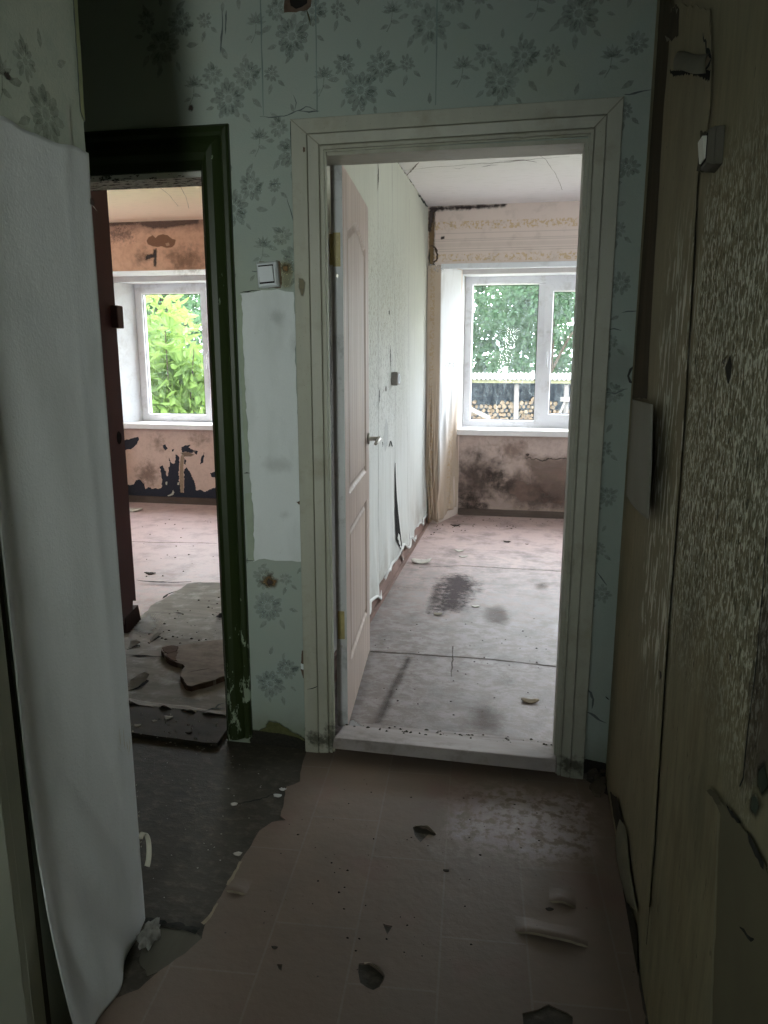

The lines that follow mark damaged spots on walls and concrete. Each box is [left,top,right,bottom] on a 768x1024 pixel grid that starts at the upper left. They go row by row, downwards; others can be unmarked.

spalling [284,0,311,13]
crack [378,154,581,207]
peeling [125,437,139,450]
peeling [128,445,216,498]
damp [458,453,565,509]
damp [433,575,477,613]